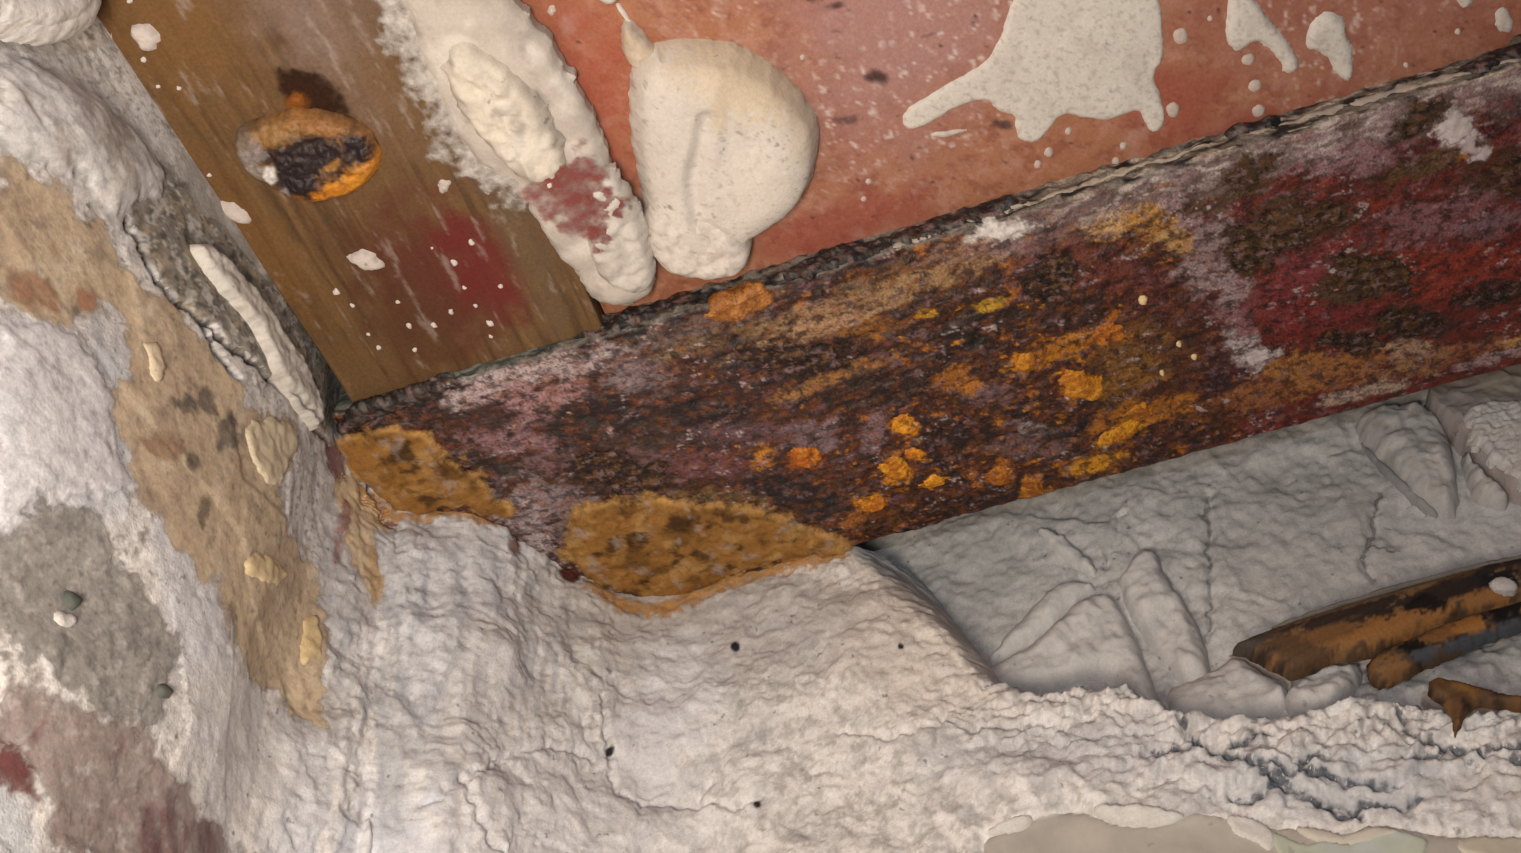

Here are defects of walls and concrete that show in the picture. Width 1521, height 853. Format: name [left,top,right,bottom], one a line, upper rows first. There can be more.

rust [278,68,349,117]
rust [1457,34,1521,75]
leakage [522,157,629,254]
rust [703,195,1019,322]
rust [566,300,668,340]
rust [1058,369,1103,401]
spalling [0,155,346,729]
rust [334,371,515,604]
rust [877,414,945,488]
rust [556,491,852,618]
crack [1203,506,1213,632]
peeling [983,803,1521,853]